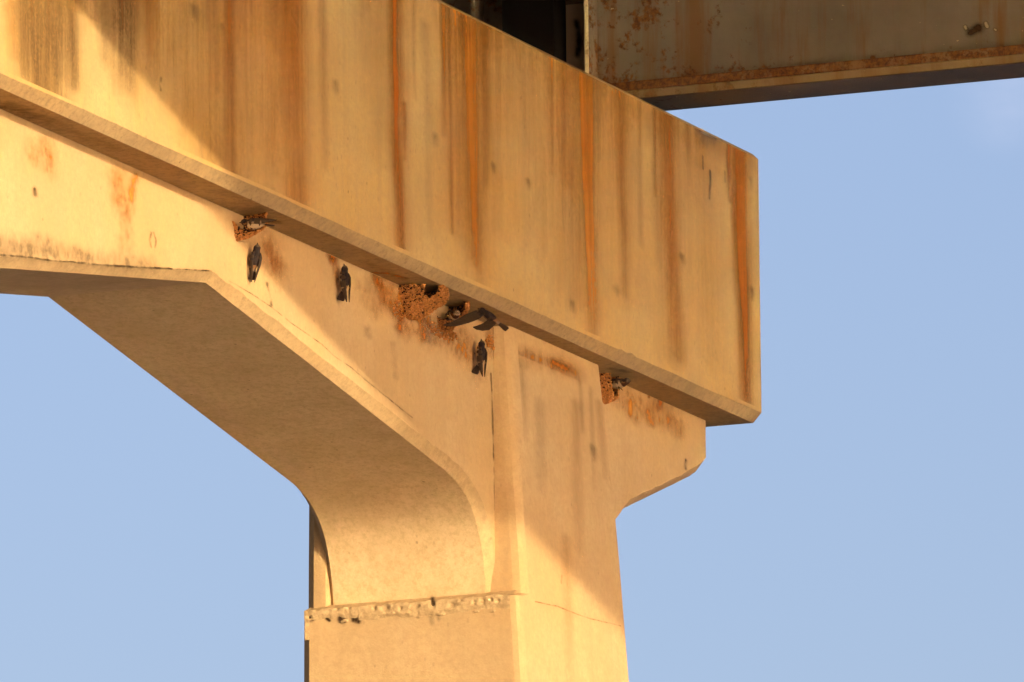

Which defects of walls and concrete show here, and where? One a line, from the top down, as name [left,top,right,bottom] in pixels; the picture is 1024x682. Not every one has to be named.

rust [391,0,405,226]
rust [441,3,483,268]
rust [577,71,625,328]
rust [728,144,749,399]
rust [964,22,997,36]